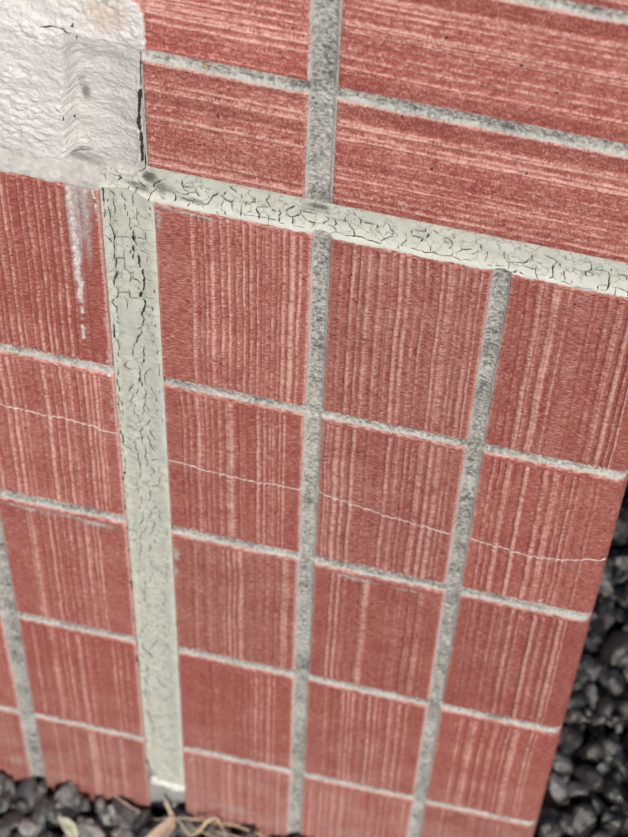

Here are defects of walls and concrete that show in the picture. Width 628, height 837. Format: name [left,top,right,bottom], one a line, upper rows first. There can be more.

crack [136,52,144,161]
crack [1,175,628,780]